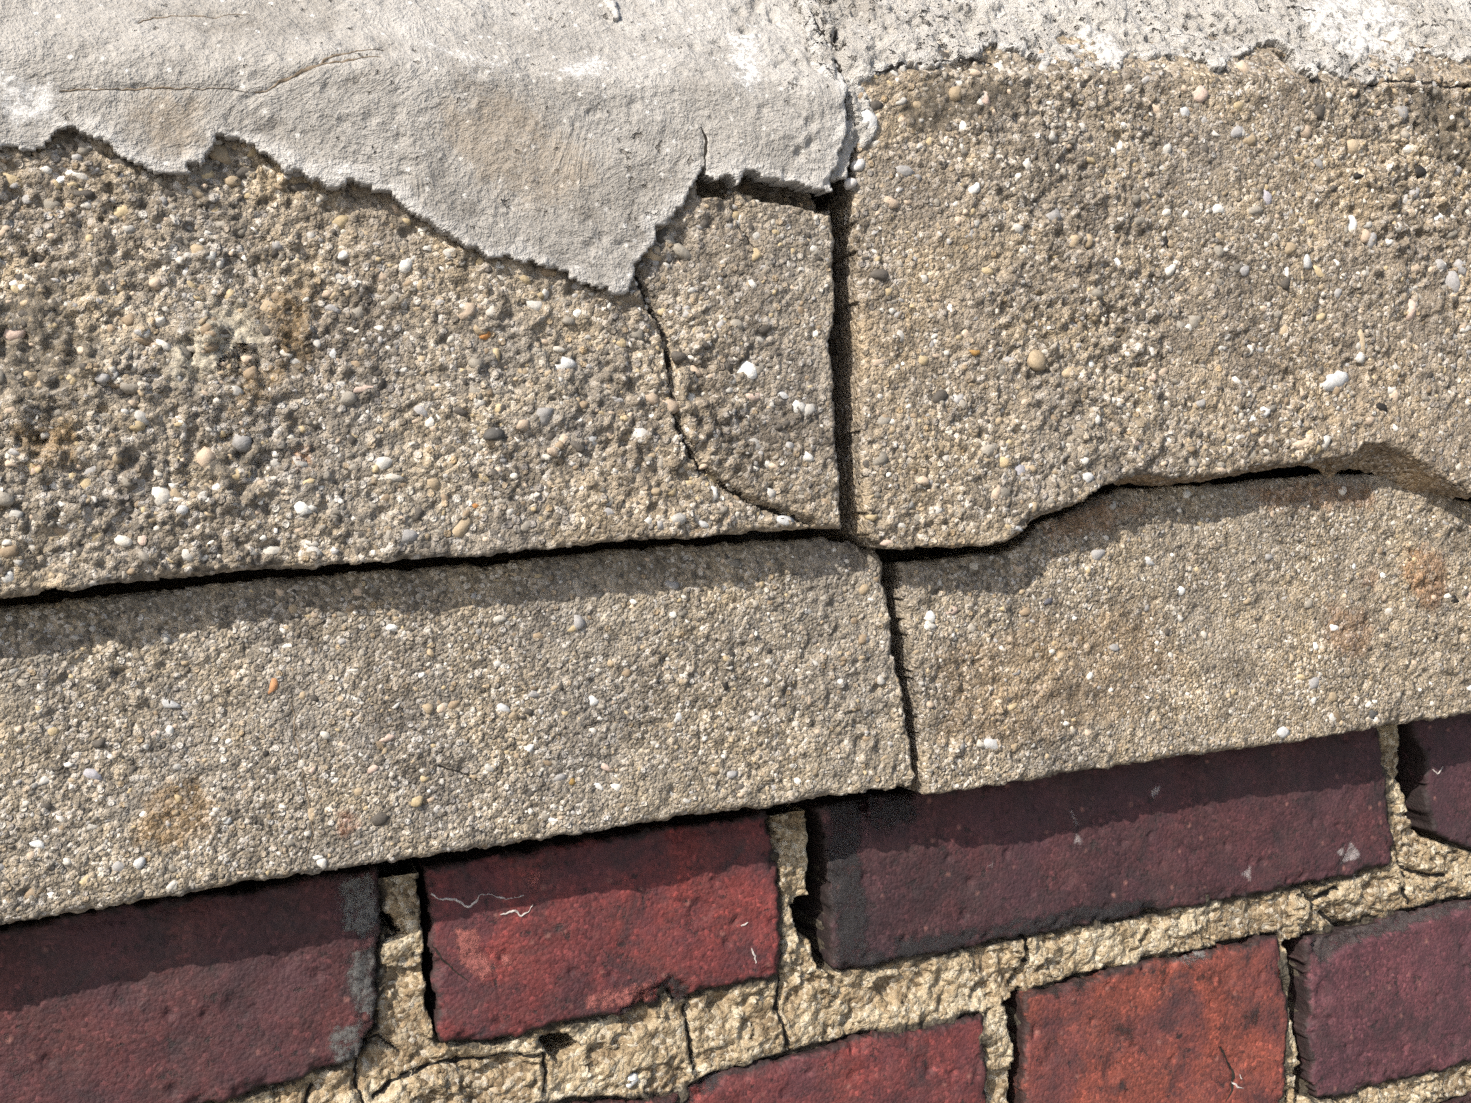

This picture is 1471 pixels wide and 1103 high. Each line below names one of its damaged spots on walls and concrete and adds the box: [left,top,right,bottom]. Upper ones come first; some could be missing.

peeling [0,0,848,296]
crack [634,276,807,524]
spalling [1104,443,1471,500]
crack [291,703,314,864]
crack [438,765,483,786]
damp [330,874,379,1063]
crack [681,996,695,1070]